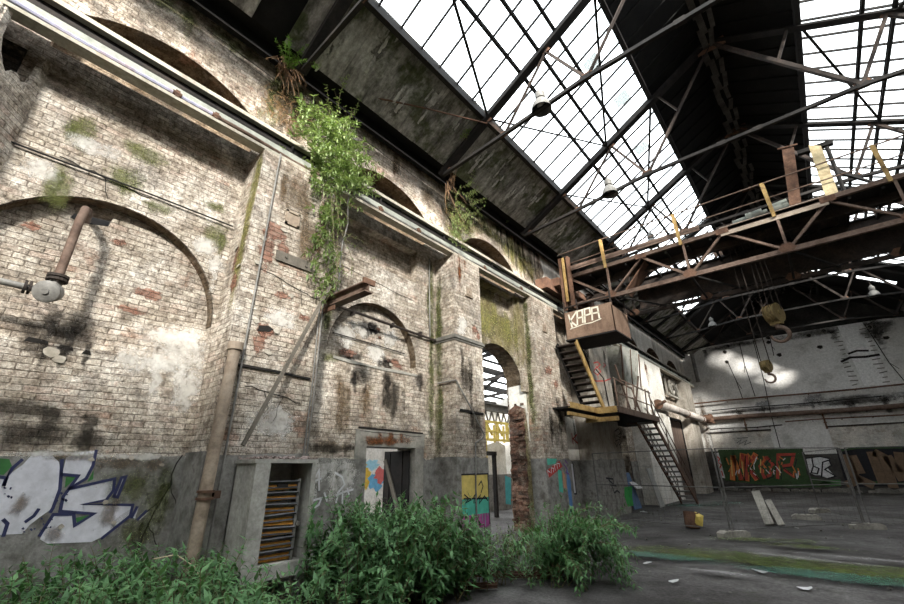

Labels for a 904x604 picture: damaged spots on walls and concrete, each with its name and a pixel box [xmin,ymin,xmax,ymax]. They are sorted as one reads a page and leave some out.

spalling [1,37,28,73]
spalling [254,221,289,272]
leakage [59,331,75,364]
spalling [253,319,280,355]
leakage [120,329,201,407]
leakage [382,380,405,415]
leakage [39,408,63,431]
leakage [82,415,99,440]